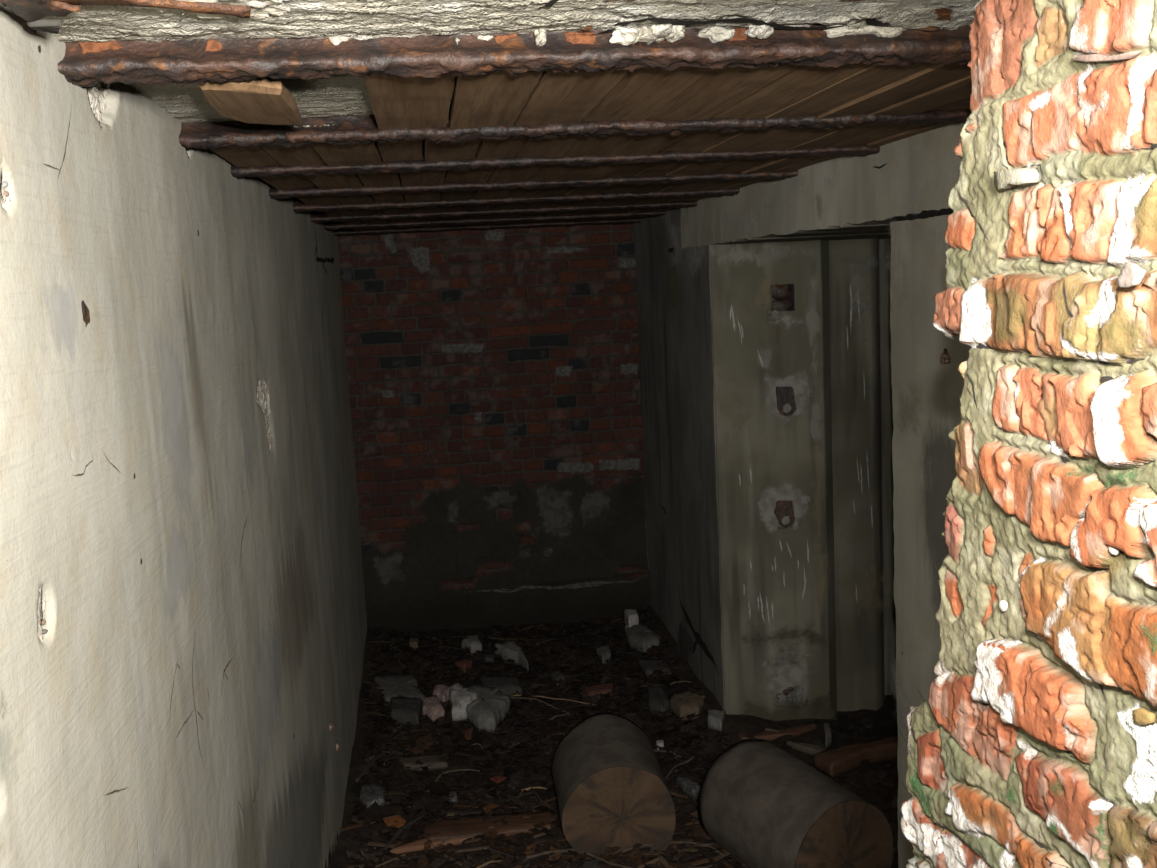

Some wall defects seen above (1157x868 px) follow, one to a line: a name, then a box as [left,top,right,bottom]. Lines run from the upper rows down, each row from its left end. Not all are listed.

rust [79,41,123,54]
rust [0,0,251,34]
rust [206,39,222,52]
rust [564,26,596,44]
rust [728,27,747,41]
water stain [933,279,992,348]
water stain [1090,376,1129,467]
spalling [37,583,48,642]
water stain [1044,582,1094,681]
water stain [971,639,1022,724]
water stain [1117,666,1157,804]
water stain [901,789,1016,868]